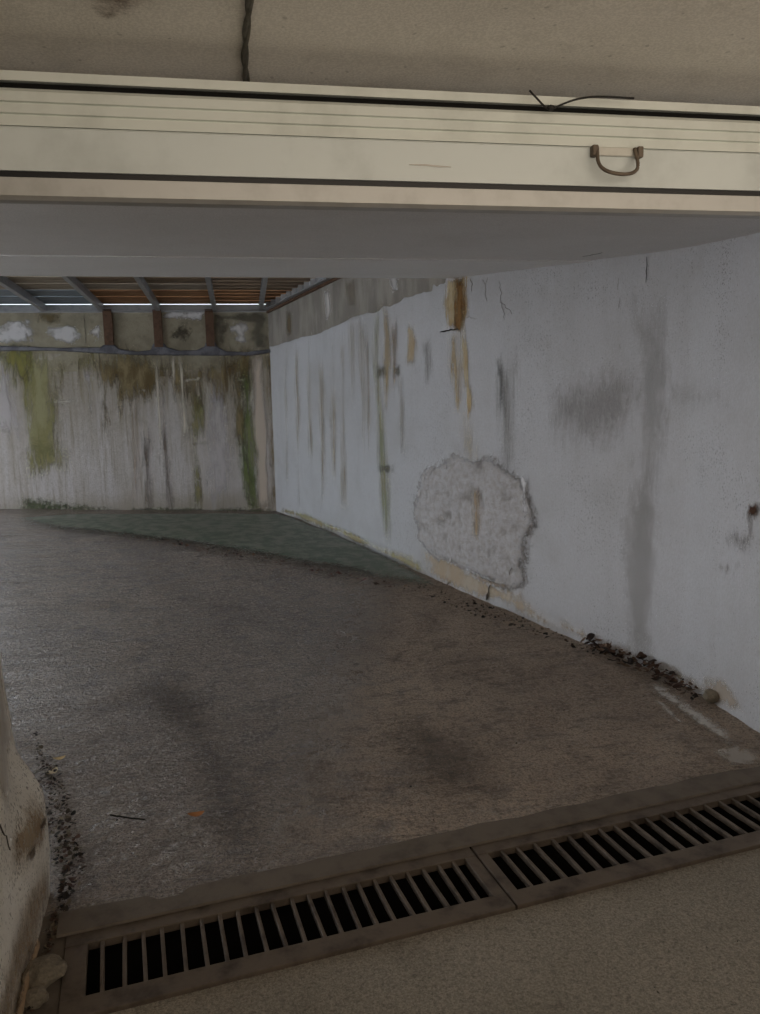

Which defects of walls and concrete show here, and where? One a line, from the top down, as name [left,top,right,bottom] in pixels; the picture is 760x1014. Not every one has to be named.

water stain [0,321,32,343]
water stain [41,313,99,343]
water stain [12,354,73,473]
water stain [95,312,275,510]
water stain [377,321,399,527]
flaking render [413,454,536,589]